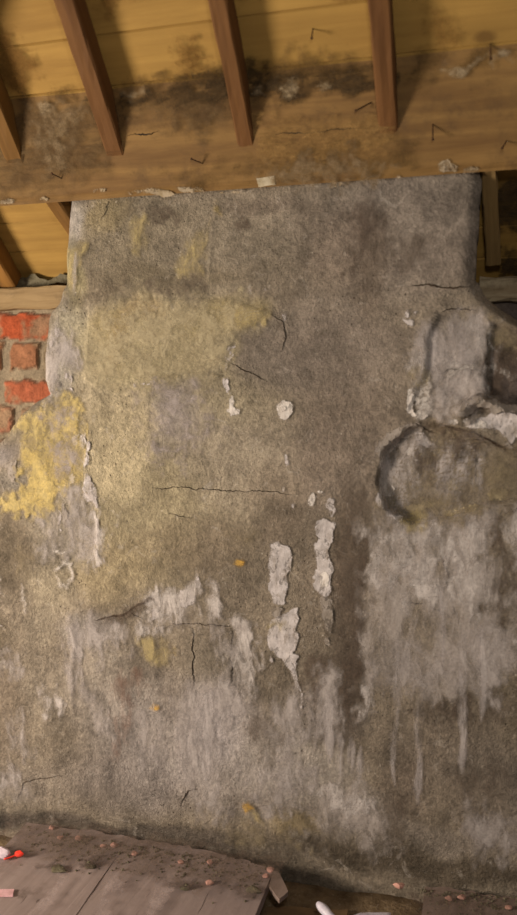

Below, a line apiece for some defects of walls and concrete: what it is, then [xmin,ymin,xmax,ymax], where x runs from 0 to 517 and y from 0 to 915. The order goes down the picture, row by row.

damp [119,38,228,107]
damp [246,54,375,104]
peeling [277,400,293,420]
spalling [375,364,517,523]
flaking render [43,434,102,588]
crack [152,487,289,495]
peeling [308,490,336,646]
crack [95,595,152,624]
crack [173,623,233,684]
damp [248,507,517,853]
damp [175,679,246,814]